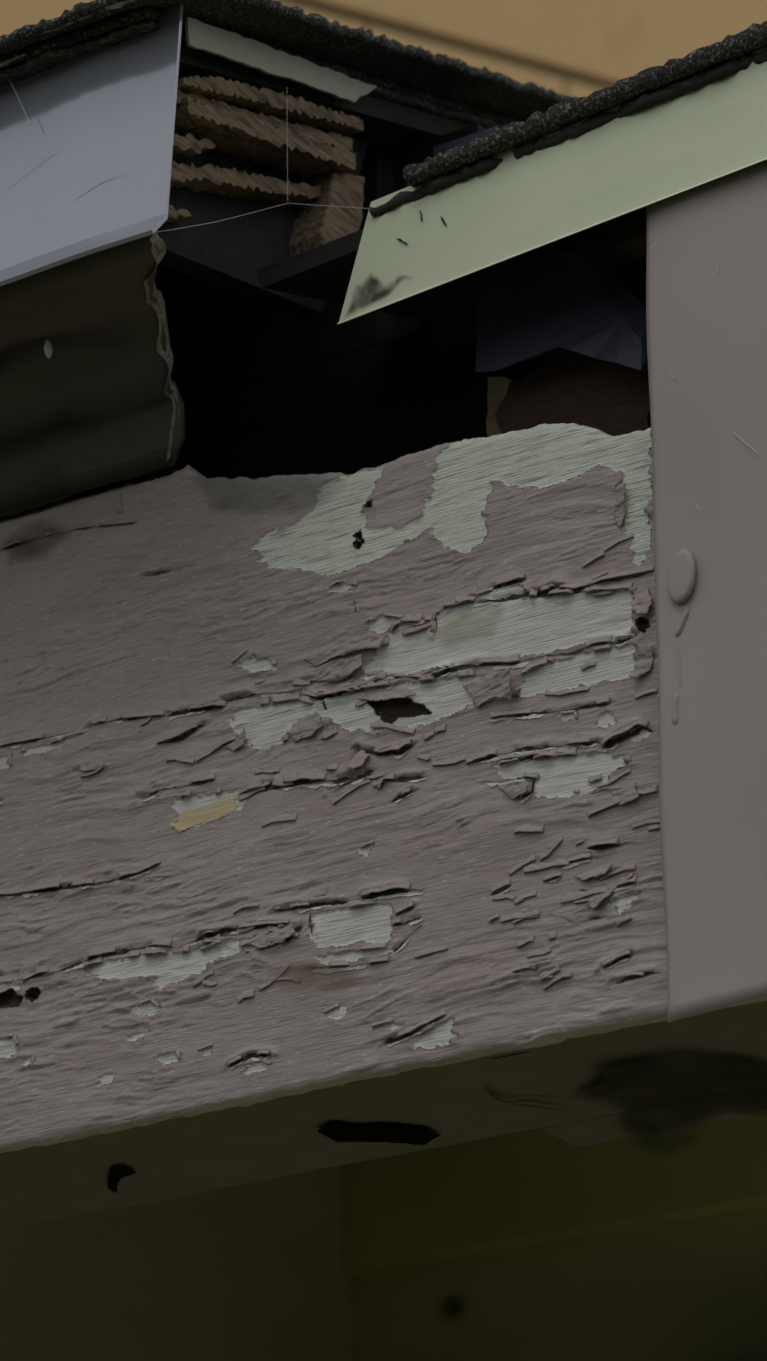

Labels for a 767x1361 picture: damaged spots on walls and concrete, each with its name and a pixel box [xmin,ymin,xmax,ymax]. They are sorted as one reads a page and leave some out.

peeling [250,423,653,593]
peeling [226,582,654,749]
peeling [348,750,370,769]
peeling [491,709,654,805]
peeling [170,788,258,832]
peeling [574,863,641,915]
peeling [0,978,25,996]
peeling [83,900,393,1042]
peeling [0,1034,35,1068]
peeling [413,1016,459,1050]
leakage [581,1054,767,1153]
spalling [317,1123,441,1145]